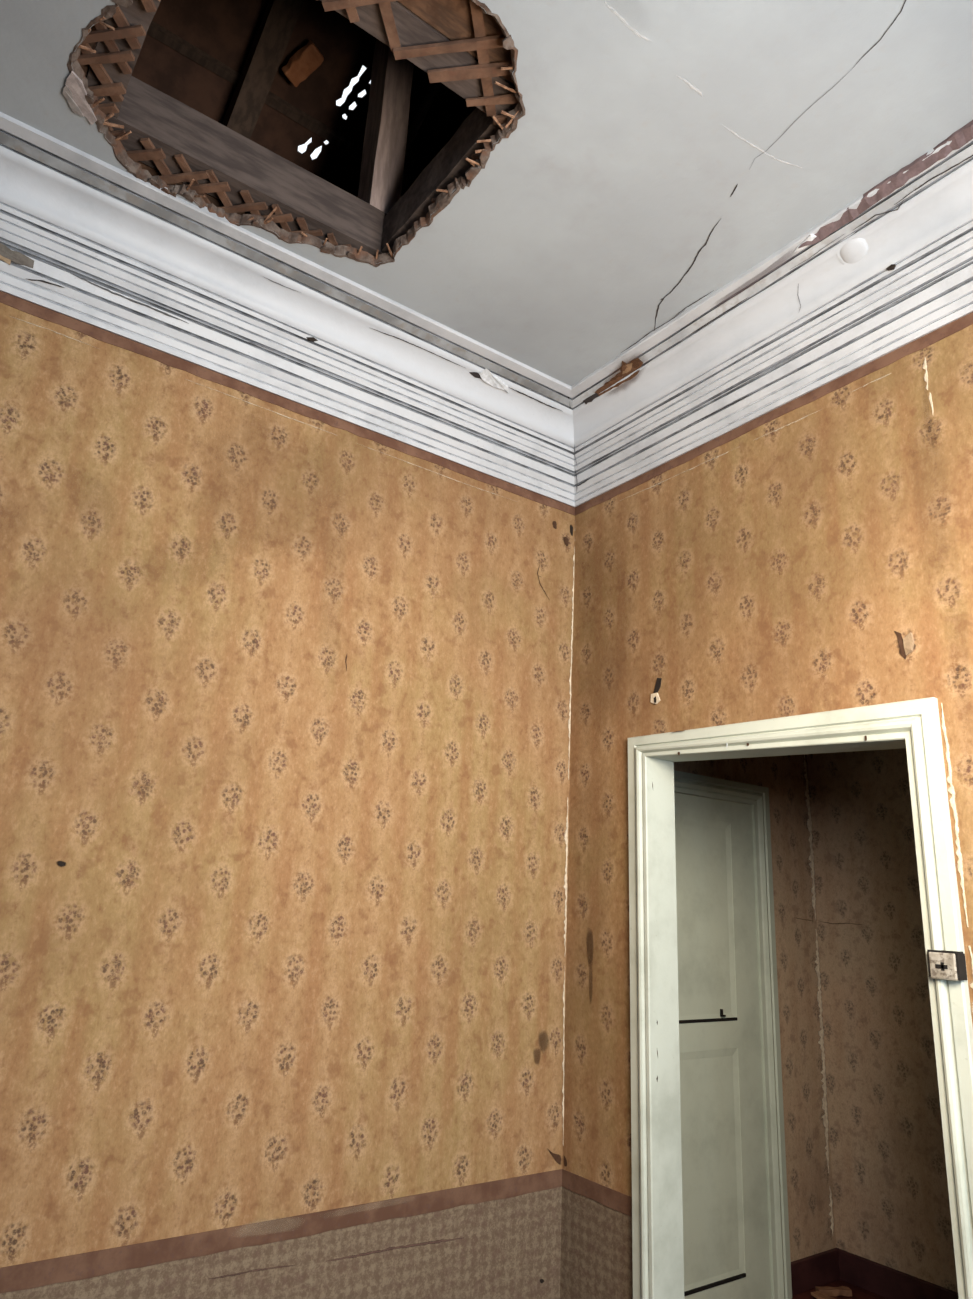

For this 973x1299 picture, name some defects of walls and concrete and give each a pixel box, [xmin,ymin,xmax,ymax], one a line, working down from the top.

peeling [503,35,514,50]
peeling [62,71,97,125]
peeling [148,178,193,203]
peeling [465,148,491,181]
crack [621,0,906,371]
peeling [794,120,973,252]
peeling [320,245,356,259]
crack [790,155,973,311]
spalling [583,358,643,404]
peeling [903,632,915,655]